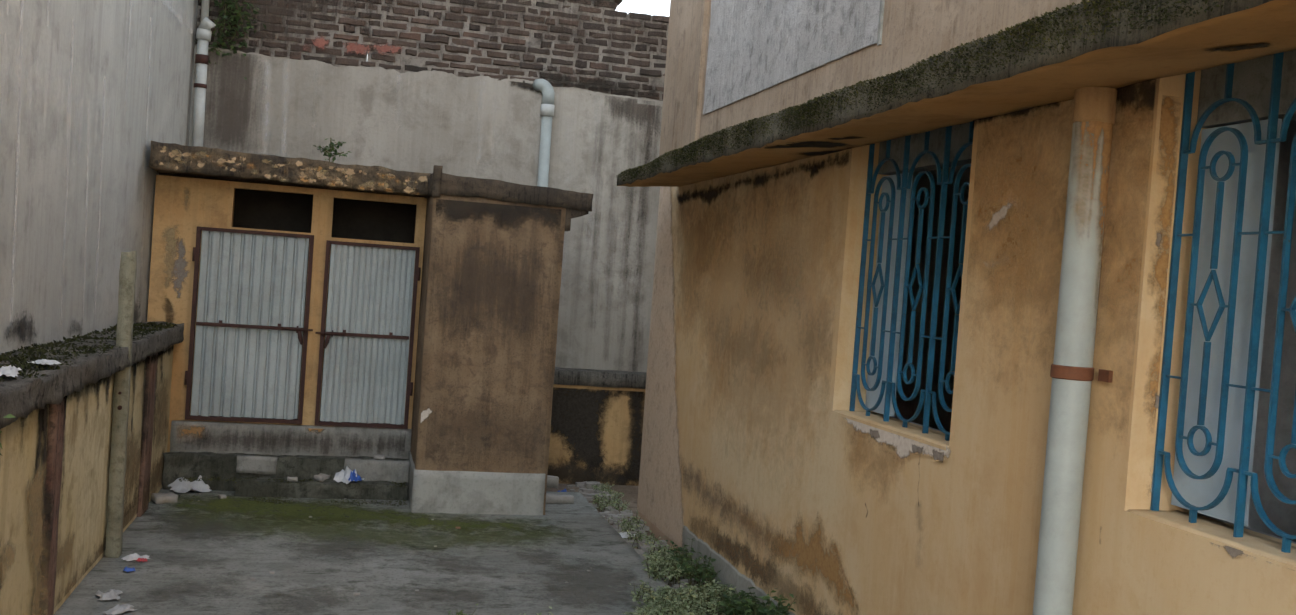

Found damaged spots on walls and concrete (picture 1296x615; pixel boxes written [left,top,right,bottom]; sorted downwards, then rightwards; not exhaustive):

damp [972,102,1058,128]
damp [678,152,849,204]
damp [131,345,174,450]
damp [547,387,645,486]
flaking render [846,418,950,462]
damp [22,374,115,615]
damp [684,470,854,609]